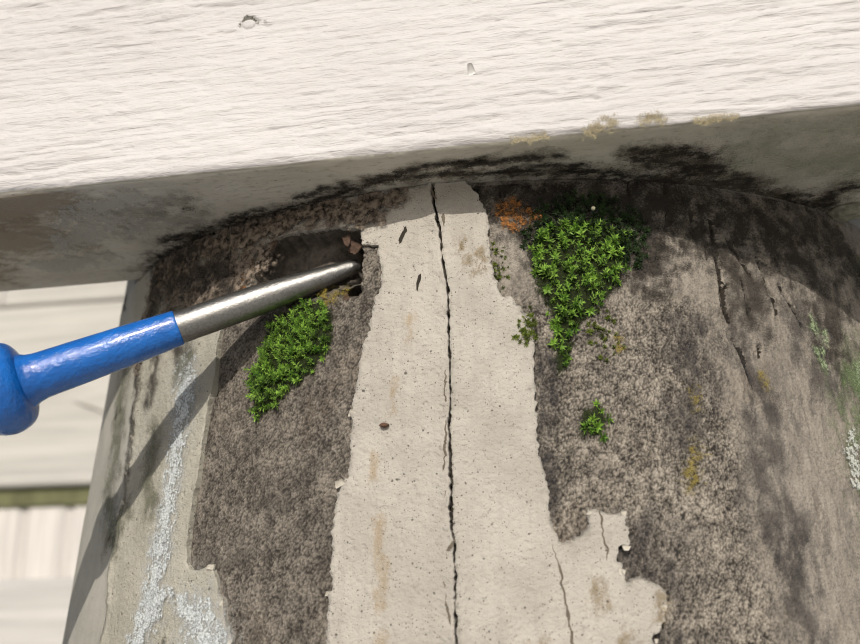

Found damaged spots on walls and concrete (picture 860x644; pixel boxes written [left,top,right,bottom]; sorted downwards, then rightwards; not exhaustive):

leakage [0,189,149,286]
leakage [141,131,860,371]
leakage [114,342,229,644]
peeling [190,229,382,644]
crack [431,187,458,638]
crack [552,547,574,644]
peeling [468,179,860,644]
leakage [842,428,860,490]